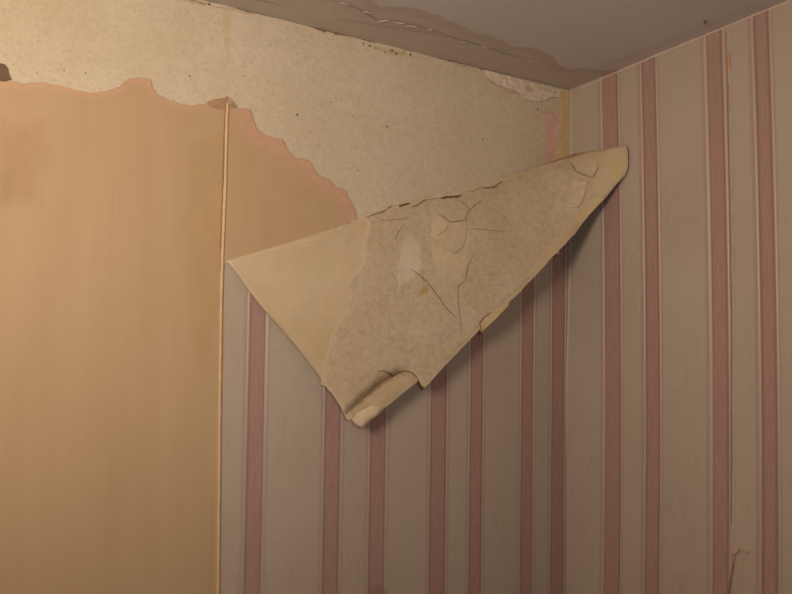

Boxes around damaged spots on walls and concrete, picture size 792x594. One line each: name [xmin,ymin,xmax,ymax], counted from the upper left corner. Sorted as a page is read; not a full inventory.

flaking render [0,0,628,428]